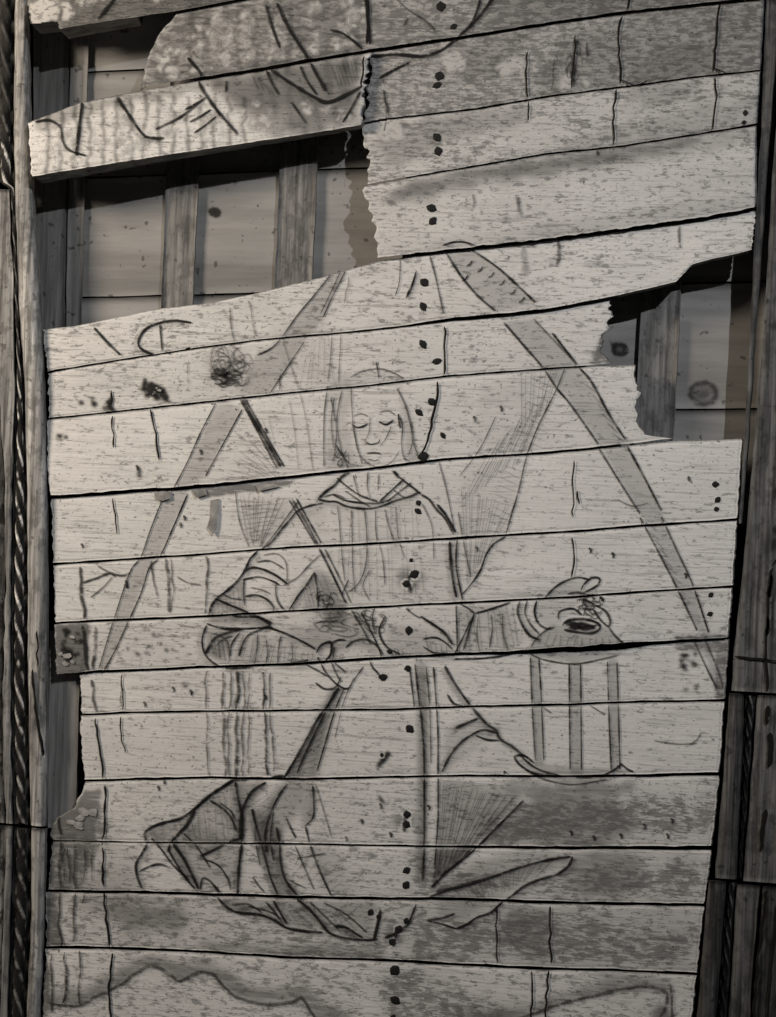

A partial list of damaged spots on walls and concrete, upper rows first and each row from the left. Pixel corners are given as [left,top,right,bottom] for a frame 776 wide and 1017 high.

peeling [157,12,255,78]
peeling [268,14,287,59]
peeling [304,2,321,54]
peeling [331,0,366,50]